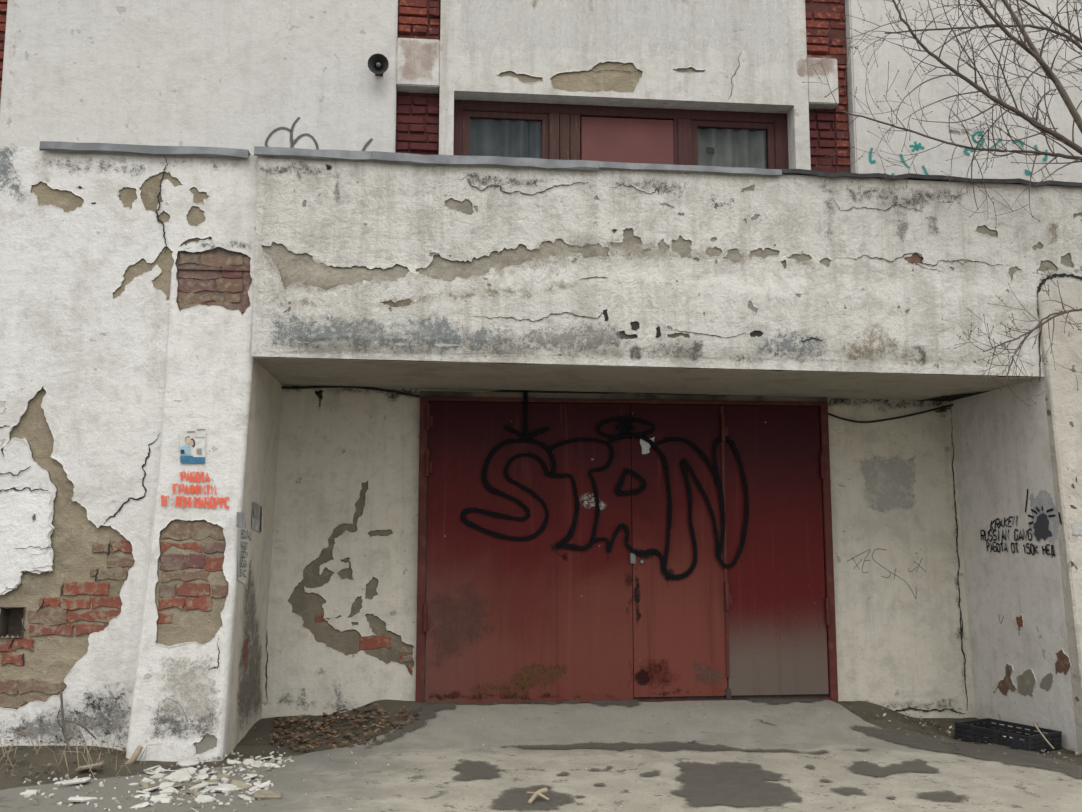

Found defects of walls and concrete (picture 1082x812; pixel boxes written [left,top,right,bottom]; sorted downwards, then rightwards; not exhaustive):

crack [155,157,168,253]
flaking render [111,171,253,316]
spalling [261,227,831,292]
crack [460,177,675,208]
leakage [271,315,703,361]
leakage [733,331,824,363]
leakage [843,325,939,368]
crack [104,433,160,524]
flaking render [0,384,136,711]
flaking render [154,518,231,649]
spalling [287,480,415,677]
crack [895,411,968,714]